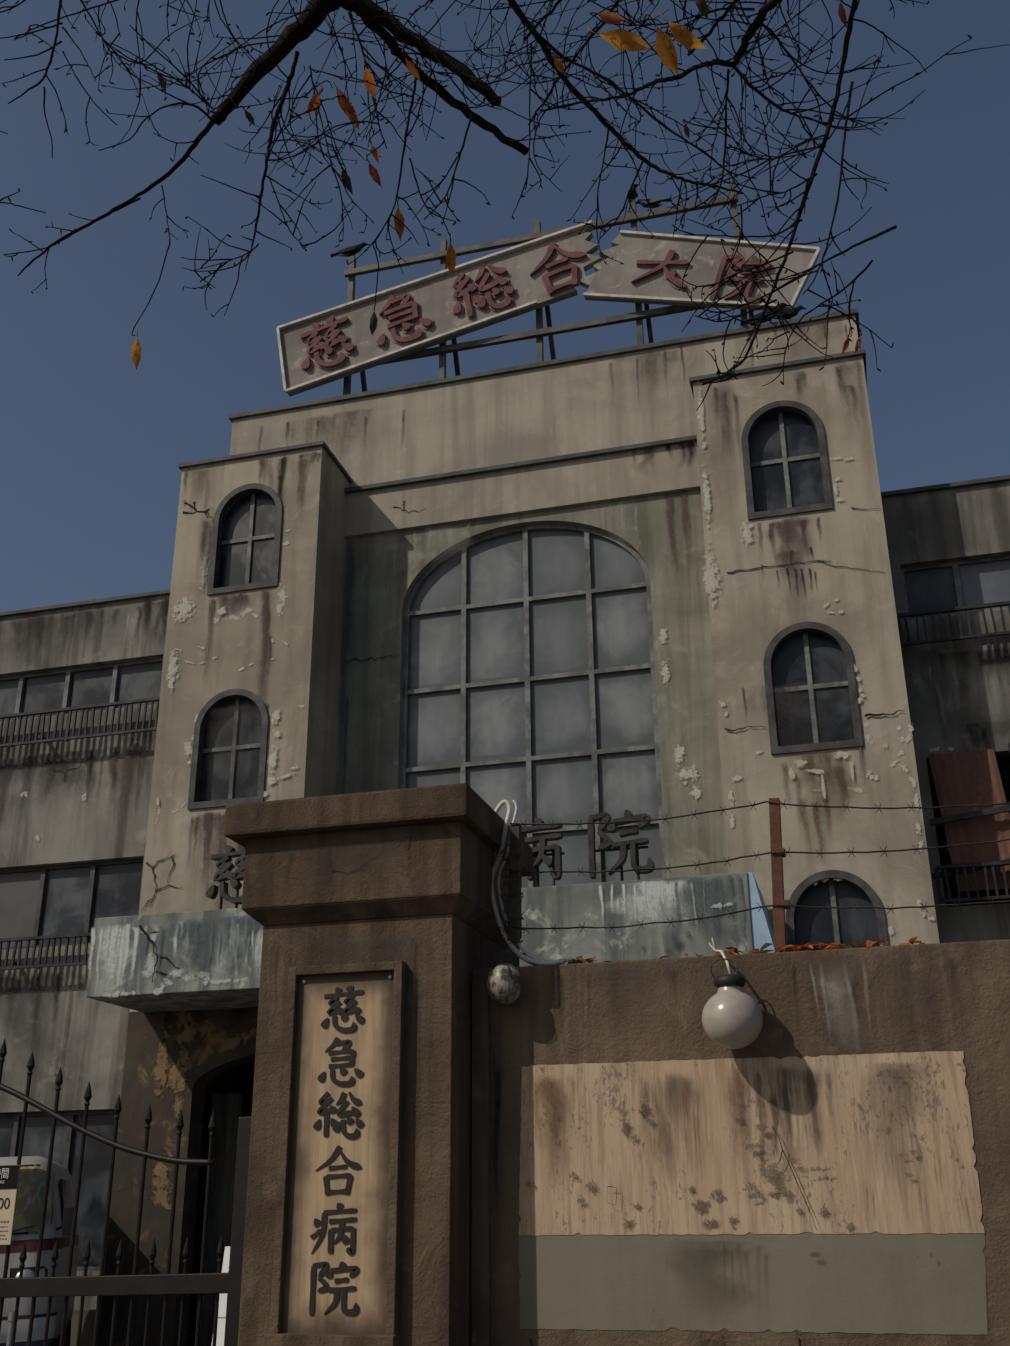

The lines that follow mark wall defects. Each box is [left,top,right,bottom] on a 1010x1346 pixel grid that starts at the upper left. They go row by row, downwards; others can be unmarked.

leakage [761,547,816,584]
crack [727,560,881,573]
peeling [658,629,670,687]
peeling [674,744,702,799]
peeling [788,751,879,799]
peeling [864,721,924,851]
crack [139,854,198,982]
peeling [140,926,248,995]
peeling [153,1010,257,1118]
peeling [151,1151,173,1210]